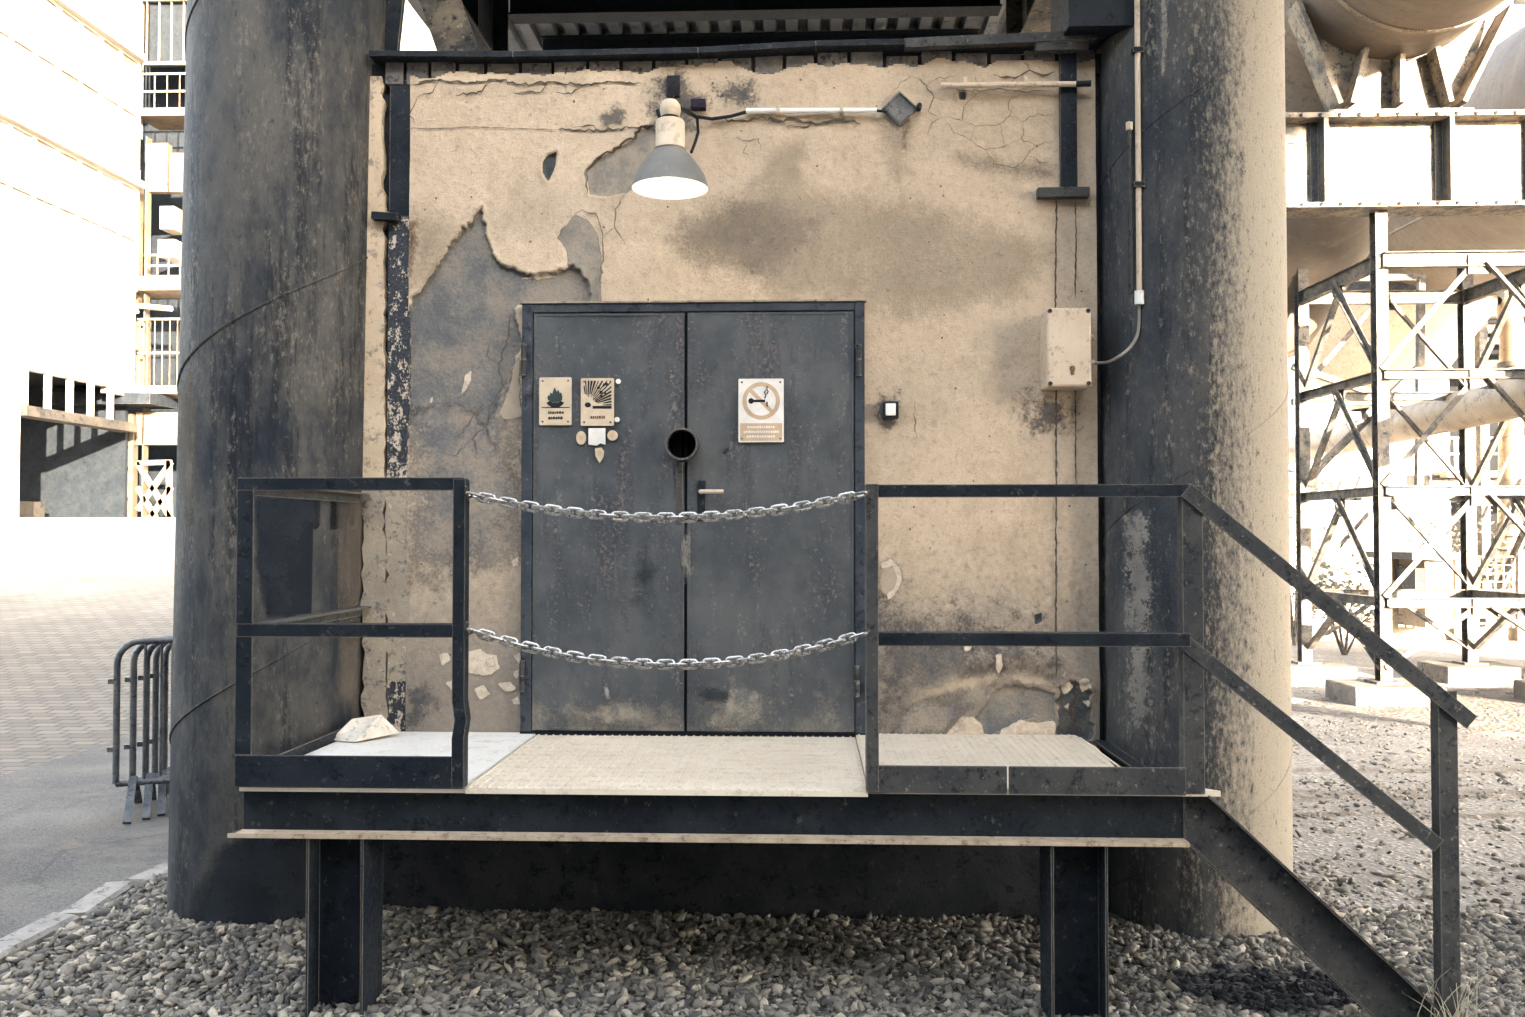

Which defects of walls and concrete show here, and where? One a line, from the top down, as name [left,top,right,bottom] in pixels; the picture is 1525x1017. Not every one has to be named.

crack [408,79,656,284]
spalling [543,152,557,180]
flaking render [584,127,656,196]
crack [896,63,1056,168]
crack [1054,201,1077,308]
flaking render [407,208,602,590]
crack [1055,390,1085,734]
peeling [439,653,452,691]
peeling [469,649,521,705]
flaking render [889,671,1094,741]